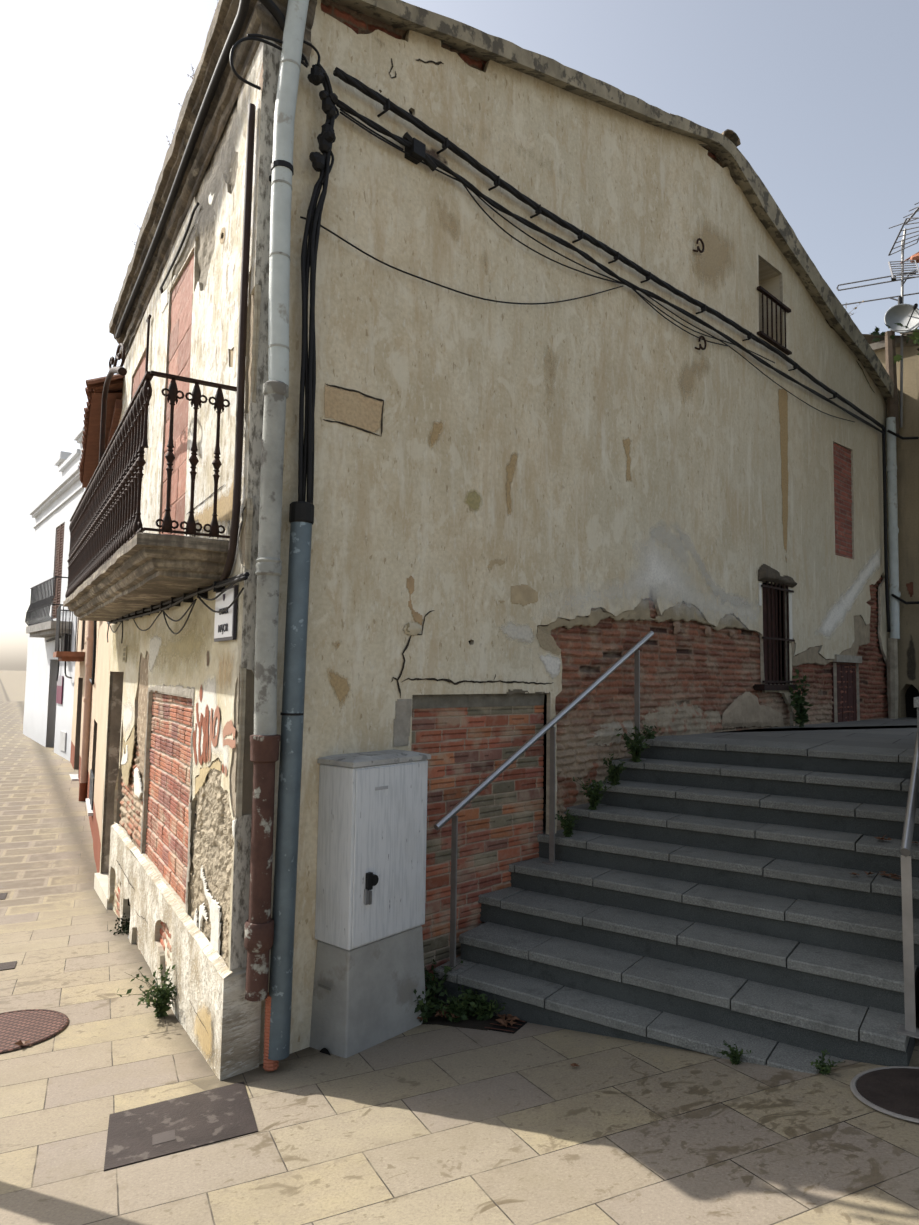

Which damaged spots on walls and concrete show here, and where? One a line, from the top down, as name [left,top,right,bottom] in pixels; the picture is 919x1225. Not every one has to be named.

peeling [171,96,238,293]
spalling [110,874,142,954]
spalling [117,653,154,851]
spalling [159,921,172,972]
spalling [190,669,254,967]
crack [392,576,554,698]
spalling [506,577,888,831]